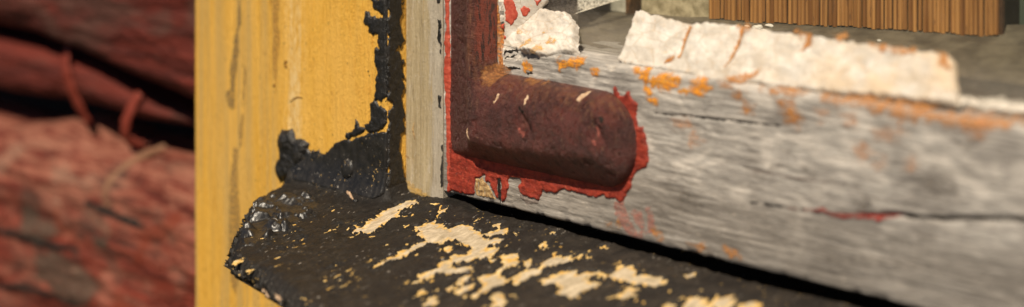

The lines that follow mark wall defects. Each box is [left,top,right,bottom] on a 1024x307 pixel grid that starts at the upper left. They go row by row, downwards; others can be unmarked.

rust [481,4,549,85]
rust [557,57,600,76]
peeling [275,129,320,182]
peeling [325,0,762,307]
crack [750,202,838,214]
crack [864,213,1024,222]